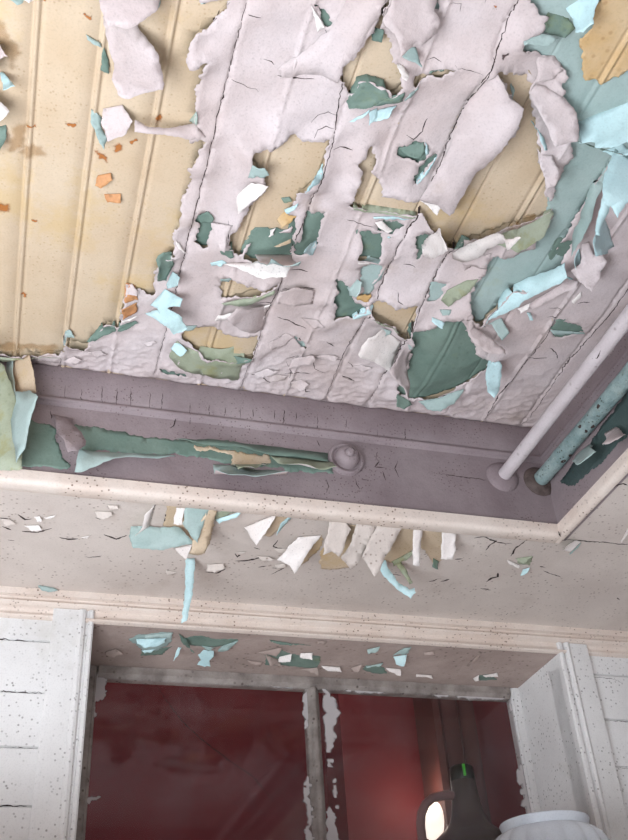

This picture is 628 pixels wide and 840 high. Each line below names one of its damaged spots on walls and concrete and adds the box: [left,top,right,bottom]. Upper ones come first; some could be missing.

peeling [278,0,451,125]
crack [427,1,518,181]
peeling [0,0,339,477]
crack [171,2,260,309]
crack [241,75,455,399]
peeling [334,0,628,411]
peeling [560,391,628,486]
peeling [129,505,240,623]
peeling [244,516,291,546]
peeling [256,522,457,599]
peeling [129,632,238,667]
peeling [246,640,411,676]